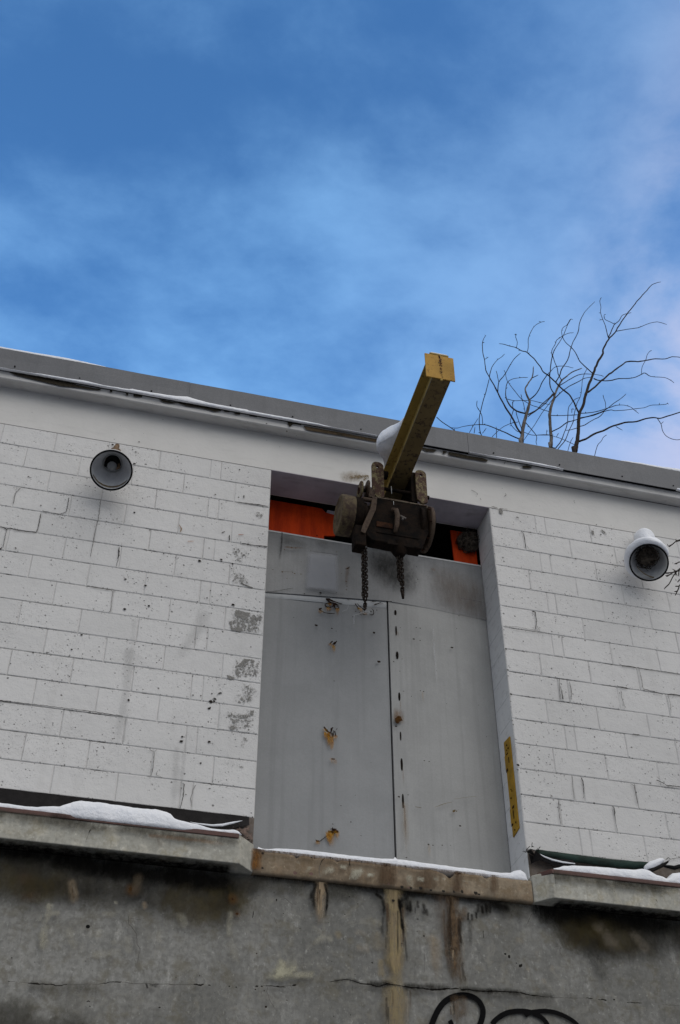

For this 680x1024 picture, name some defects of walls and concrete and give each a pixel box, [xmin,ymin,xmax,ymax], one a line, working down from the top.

peeling [229,604,263,634]
peeling [223,658,262,747]
crack [8,981,296,1007]
crack [331,950,679,1006]